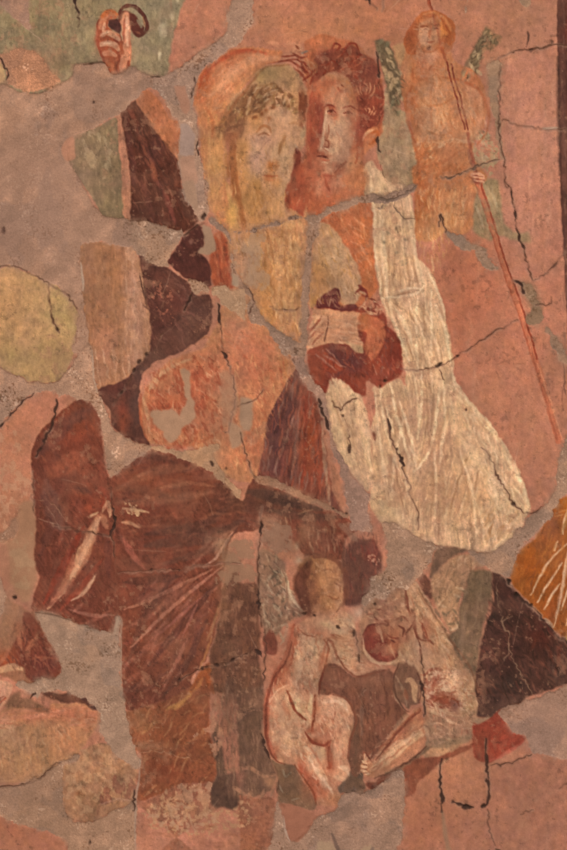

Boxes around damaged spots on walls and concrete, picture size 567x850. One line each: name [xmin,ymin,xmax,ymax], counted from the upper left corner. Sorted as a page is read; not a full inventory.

flaking render [447,231,499,271]
crack [0,265,78,334]
flaking render [0,0,444,617]
crack [419,328,505,381]
crack [388,419,409,483]
flaking render [469,438,567,578]
crack [495,470,543,515]
crack [32,479,268,688]
flaking render [16,611,142,770]
flaking render [498,686,567,761]
flaking render [269,769,406,850]
crack [438,738,532,850]